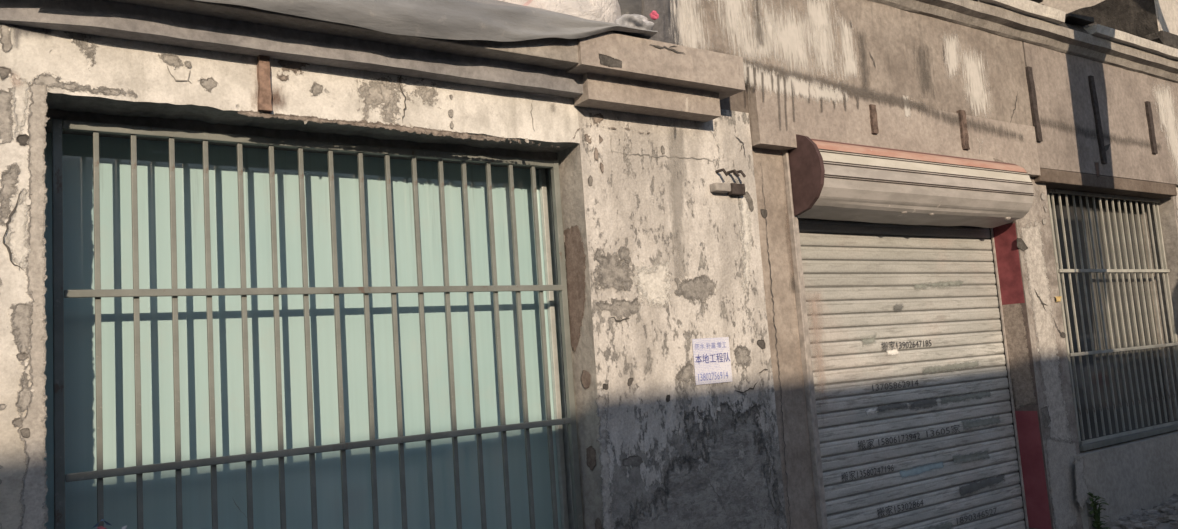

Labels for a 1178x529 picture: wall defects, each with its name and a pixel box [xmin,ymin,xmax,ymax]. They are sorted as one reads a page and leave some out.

flaking render [0,23,12,52]
flaking render [158,52,217,92]
flaking render [237,76,539,145]
water stain [670,0,924,127]
water stain [919,52,931,90]
water stain [943,36,990,116]
crack [3,191,22,269]
peeling [0,31,137,529]
flaking render [563,225,716,353]
flaking render [676,361,694,382]
flaking render [734,344,752,369]
flaking render [596,396,785,529]